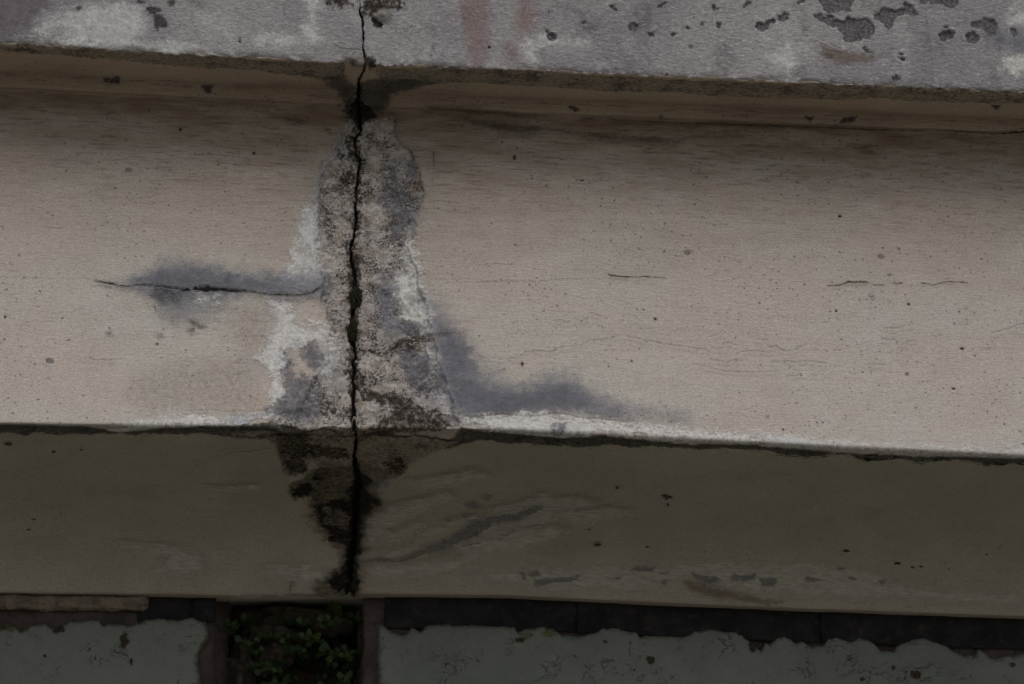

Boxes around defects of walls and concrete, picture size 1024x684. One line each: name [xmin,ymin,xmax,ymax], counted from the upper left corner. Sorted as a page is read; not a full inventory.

peeling [755,12,790,32]
peeling [814,0,959,53]
peeling [938,18,1017,44]
leakage [108,204,339,433]
crack [76,9,547,595]
leakage [312,457,625,598]